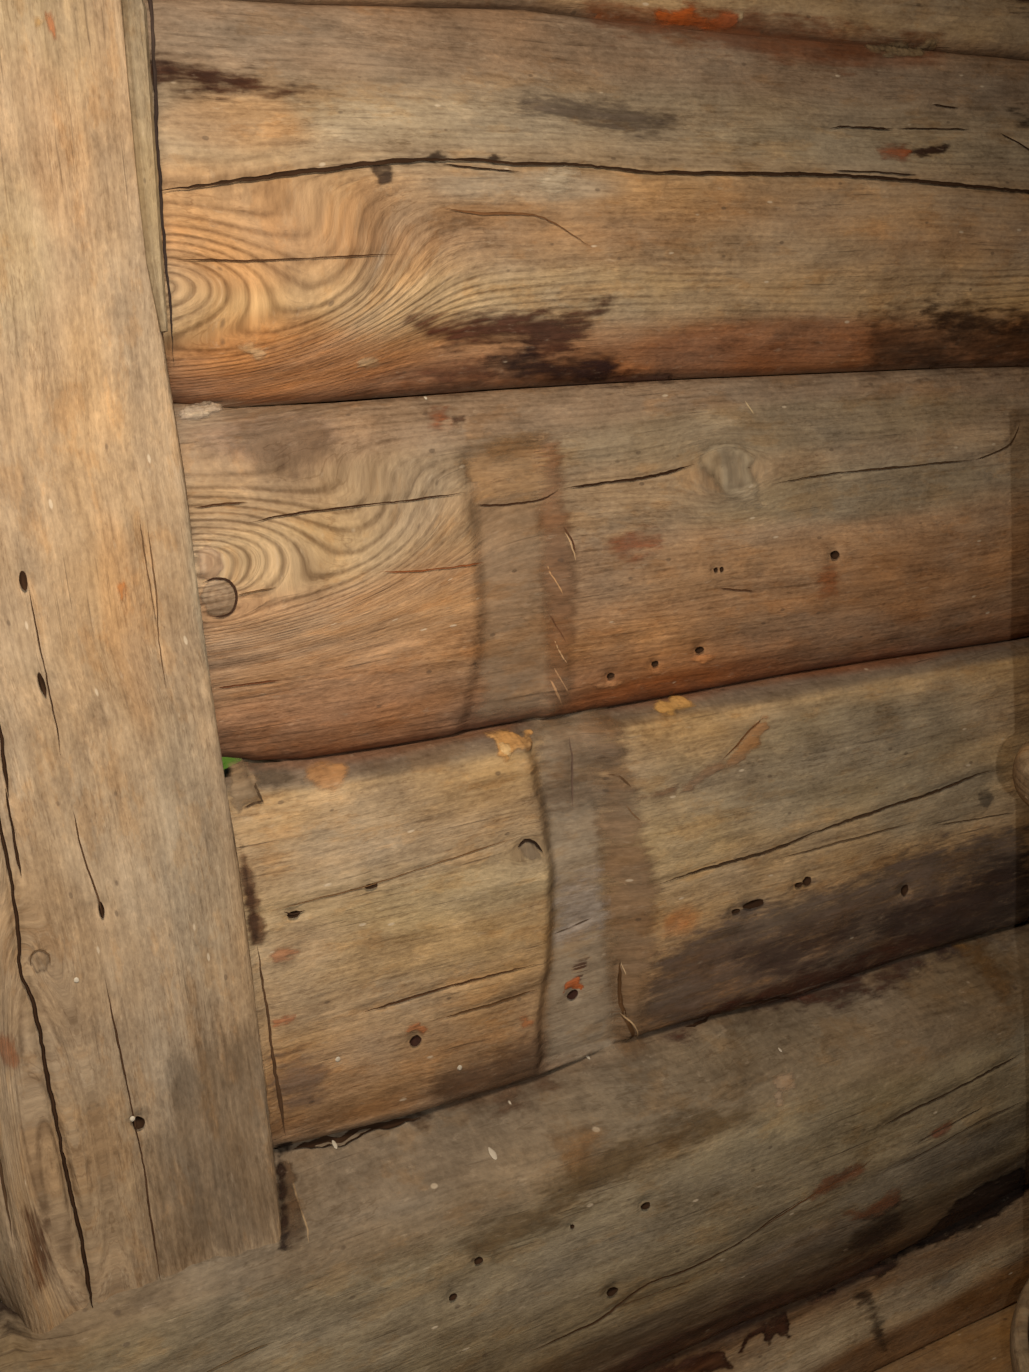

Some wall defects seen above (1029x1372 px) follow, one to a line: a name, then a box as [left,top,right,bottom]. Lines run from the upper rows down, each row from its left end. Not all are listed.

crack [833,104,966,130]
crack [159,158,1029,193]
crack [186,254,394,262]
crack [447,208,590,246]
water stain [405,295,672,386]
water stain [870,302,1029,369]
crack [28,584,61,755]
crack [657,771,1013,885]
crack [0,725,93,1308]
water stain [613,1168,1026,1372]